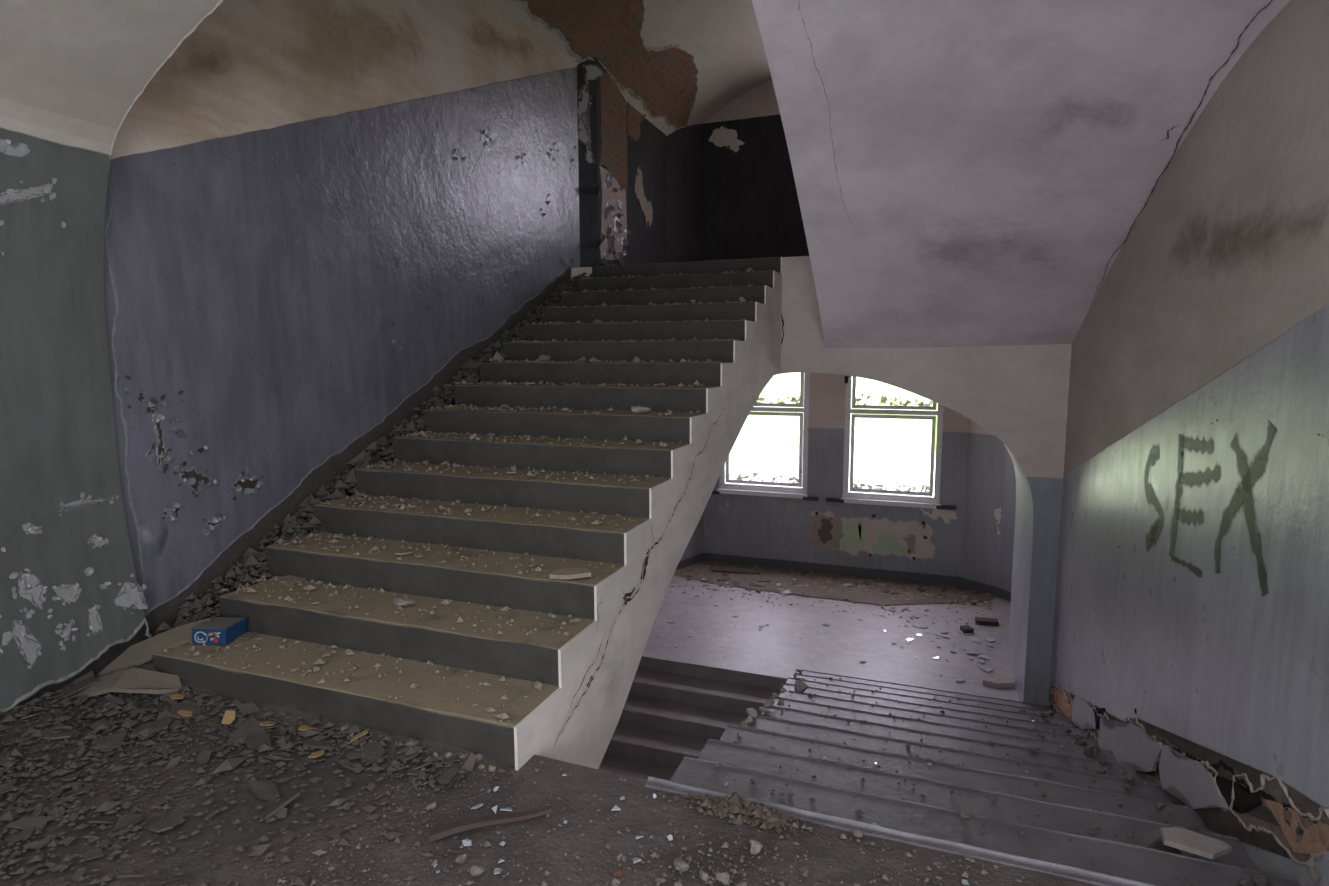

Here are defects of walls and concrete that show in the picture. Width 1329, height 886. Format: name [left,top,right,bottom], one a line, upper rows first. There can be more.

flaking render [510,0,699,266]
peeling [709,125,744,152]
crack [1090,0,1273,306]
spalling [0,0,572,715]
crack [555,407,725,744]
spalling [1048,679,1329,883]